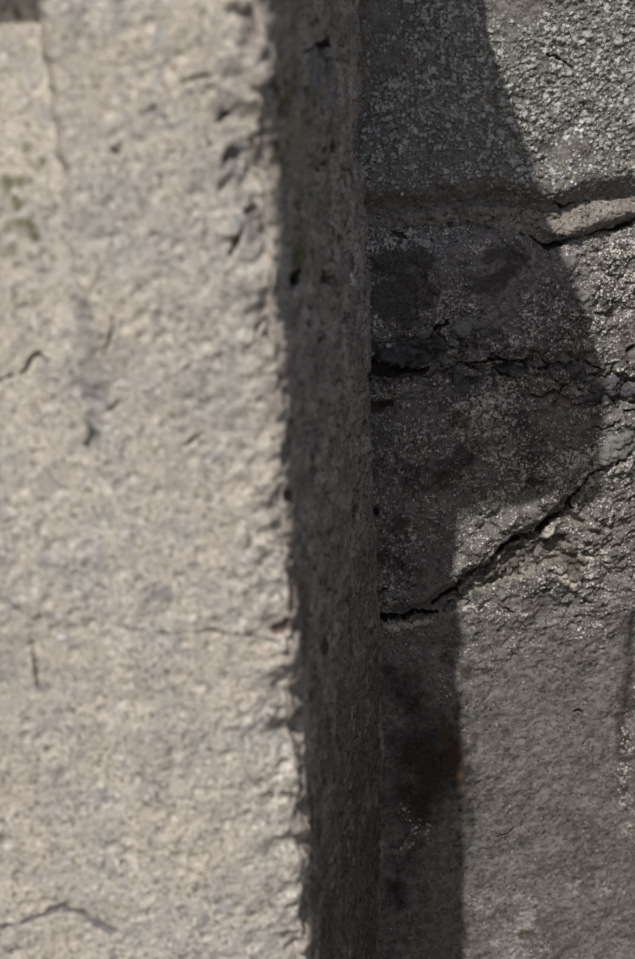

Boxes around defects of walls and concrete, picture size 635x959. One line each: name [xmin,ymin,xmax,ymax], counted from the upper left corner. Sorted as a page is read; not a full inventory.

crack [519,217,635,250]
crack [419,318,452,346]
crack [448,355,601,376]
crack [592,409,635,430]
crack [377,453,632,621]
water stain [392,729,466,858]
crack [0,900,117,935]